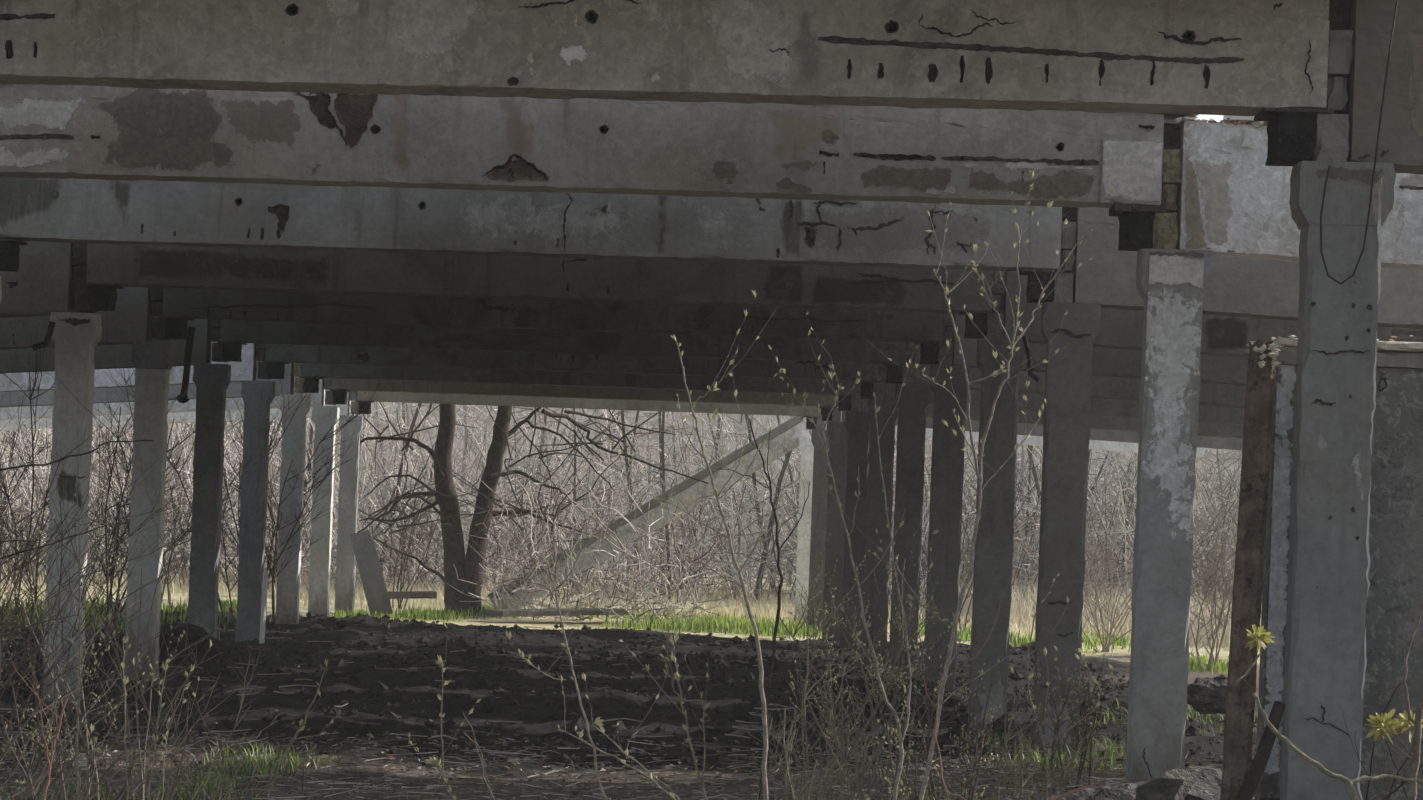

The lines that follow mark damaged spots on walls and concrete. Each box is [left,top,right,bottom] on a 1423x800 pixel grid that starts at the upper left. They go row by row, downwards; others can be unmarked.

crack [518,0,575,8]
crack [918,9,1018,37]
crack [1158,31,1241,45]
peeling [0,88,378,171]
spalling [486,159,550,182]
spalling [247,204,289,240]
crack [756,198,972,285]
peeling [1141,157,1233,541]